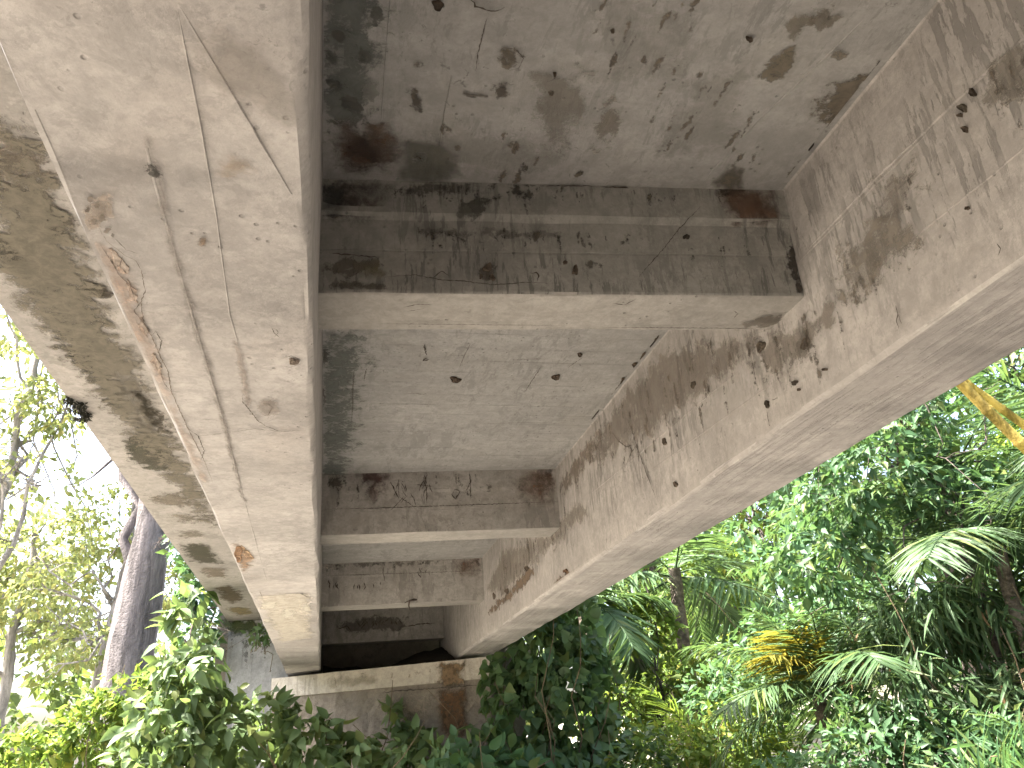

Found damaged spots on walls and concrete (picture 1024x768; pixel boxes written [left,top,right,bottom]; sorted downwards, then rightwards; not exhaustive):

leakage [324,0,392,133]
corrosion [333,124,401,172]
spalling [956,88,977,133]
peeling [83,195,138,303]
corrosion [720,189,778,227]
leakage [835,159,930,331]
crack [98,226,299,475]
leakage [707,311,821,413]
leakage [323,330,380,504]
spalling [234,545,254,571]
corrosion [437,662,467,736]